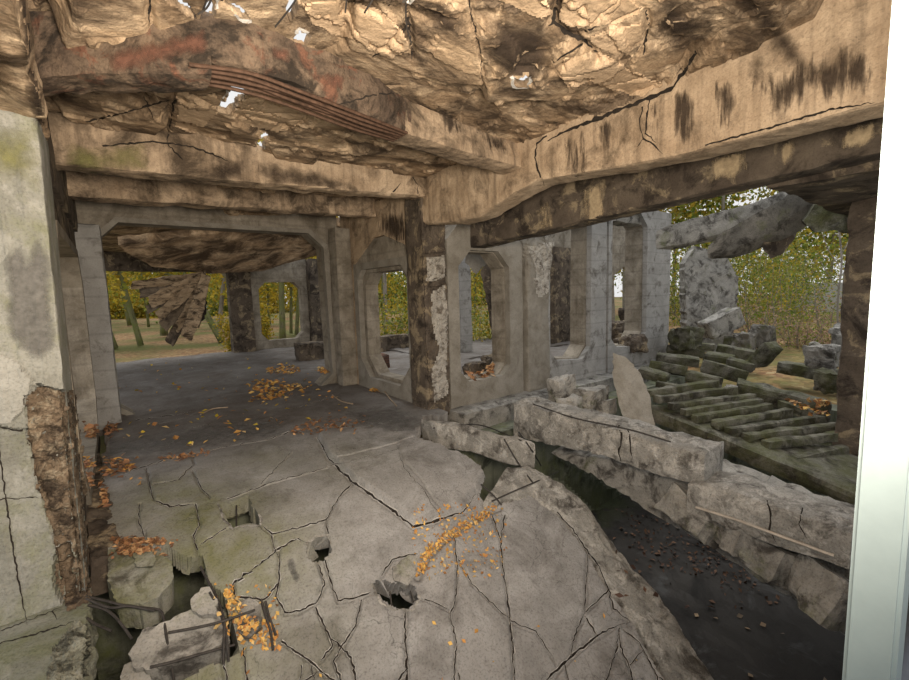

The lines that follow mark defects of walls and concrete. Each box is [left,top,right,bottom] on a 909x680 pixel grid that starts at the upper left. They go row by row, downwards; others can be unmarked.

flaking render [302,0,411,55]
flaking render [482,0,663,116]
crack [548,0,612,63]
crack [534,51,697,184]
leakage [675,92,694,141]
leakage [715,83,733,121]
crack [705,102,875,146]
leakage [747,0,865,109]
spalling [426,255,449,403]
crack [0,452,76,644]
spalling [0,355,277,680]
crack [130,425,663,680]